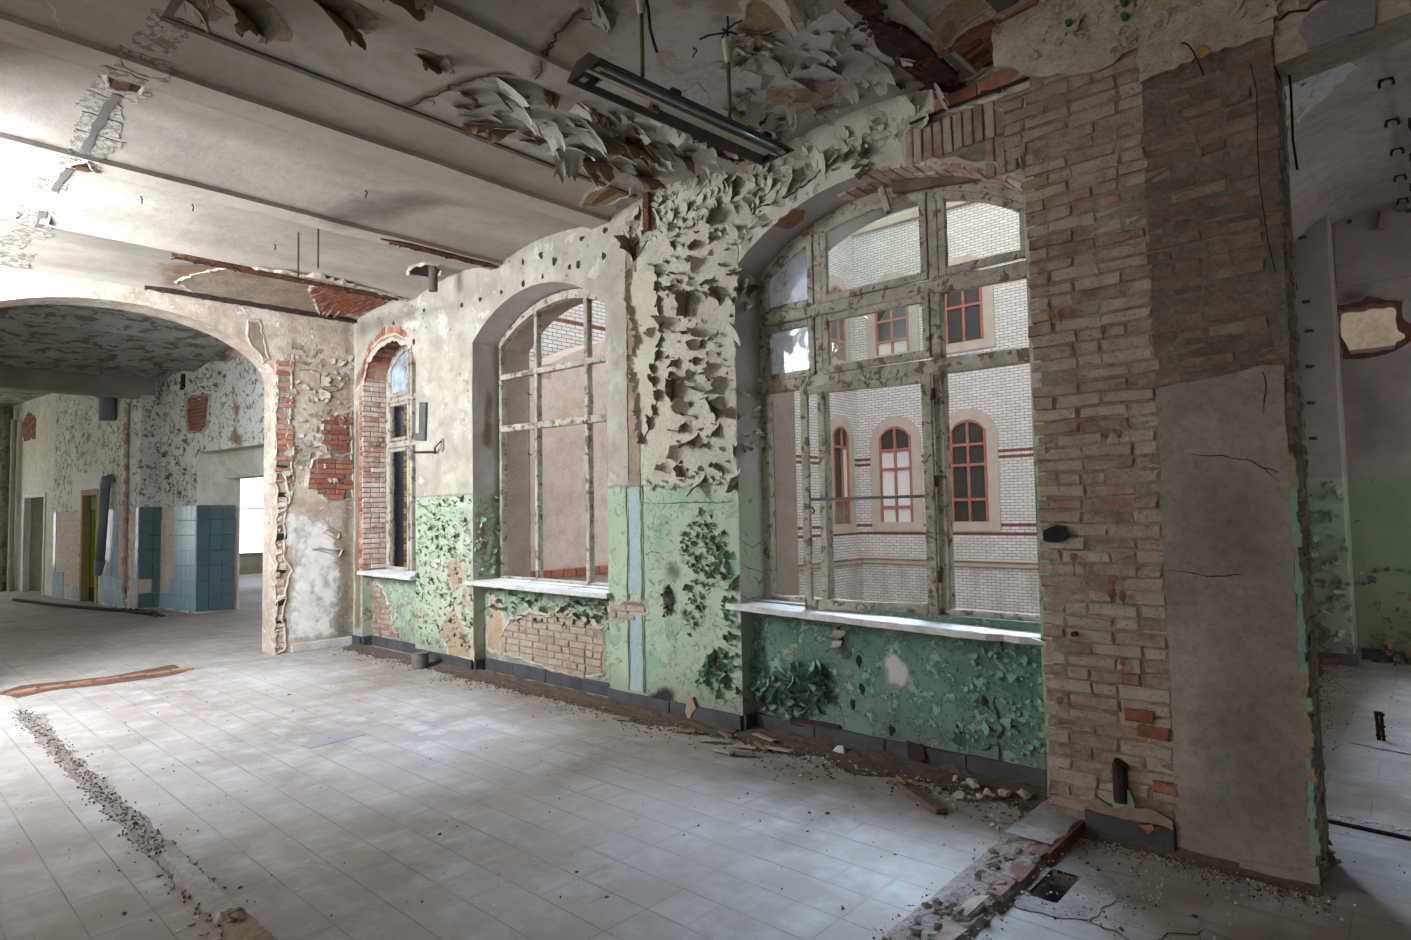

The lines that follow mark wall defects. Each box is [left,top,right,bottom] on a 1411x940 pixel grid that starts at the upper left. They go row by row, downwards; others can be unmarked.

peeling [183,0,292,45]
peeling [313,0,378,51]
peeling [383,0,435,22]
crack [1279,0,1330,21]
flaking render [66,160,102,174]
flaking render [406,262,446,279]
spalling [1337,294,1411,361]
peeling [414,0,1145,722]
flaking render [156,372,226,502]
spalling [173,266,650,680]
peeling [951,641,1046,755]
crack [1081,919,1232,940]